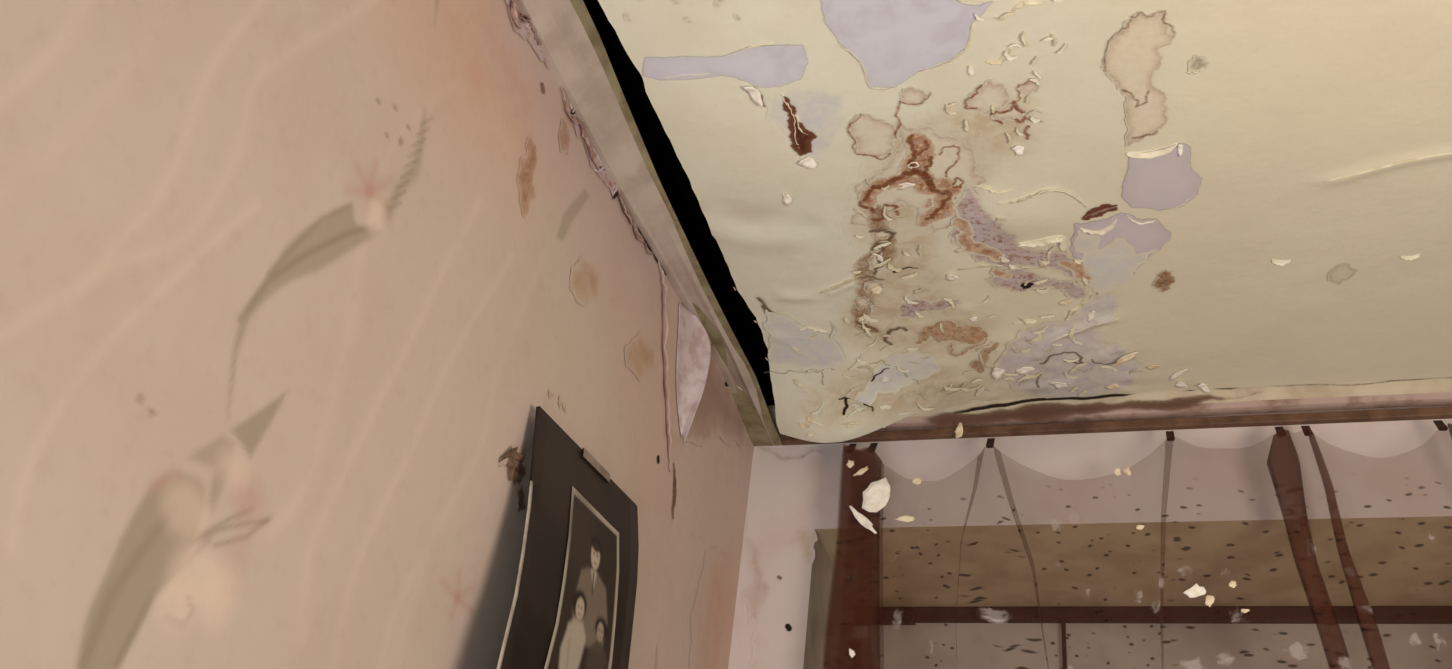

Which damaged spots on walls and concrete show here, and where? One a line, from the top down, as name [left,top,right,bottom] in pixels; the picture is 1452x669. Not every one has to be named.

water stain [428,0,571,222]
peeling [643,43,847,170]
peeling [821,0,1068,156]
water stain [1101,11,1175,147]
peeling [754,143,1211,437]
water stain [758,78,1224,462]